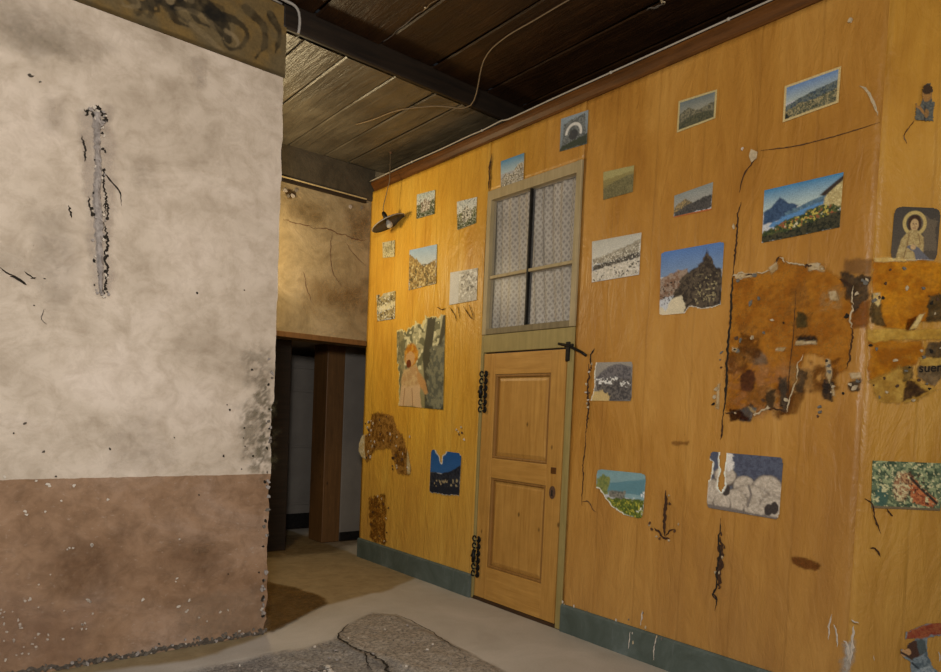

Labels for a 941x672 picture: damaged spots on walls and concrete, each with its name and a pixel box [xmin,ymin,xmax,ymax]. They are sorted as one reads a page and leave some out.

crack [712,518,725,608]